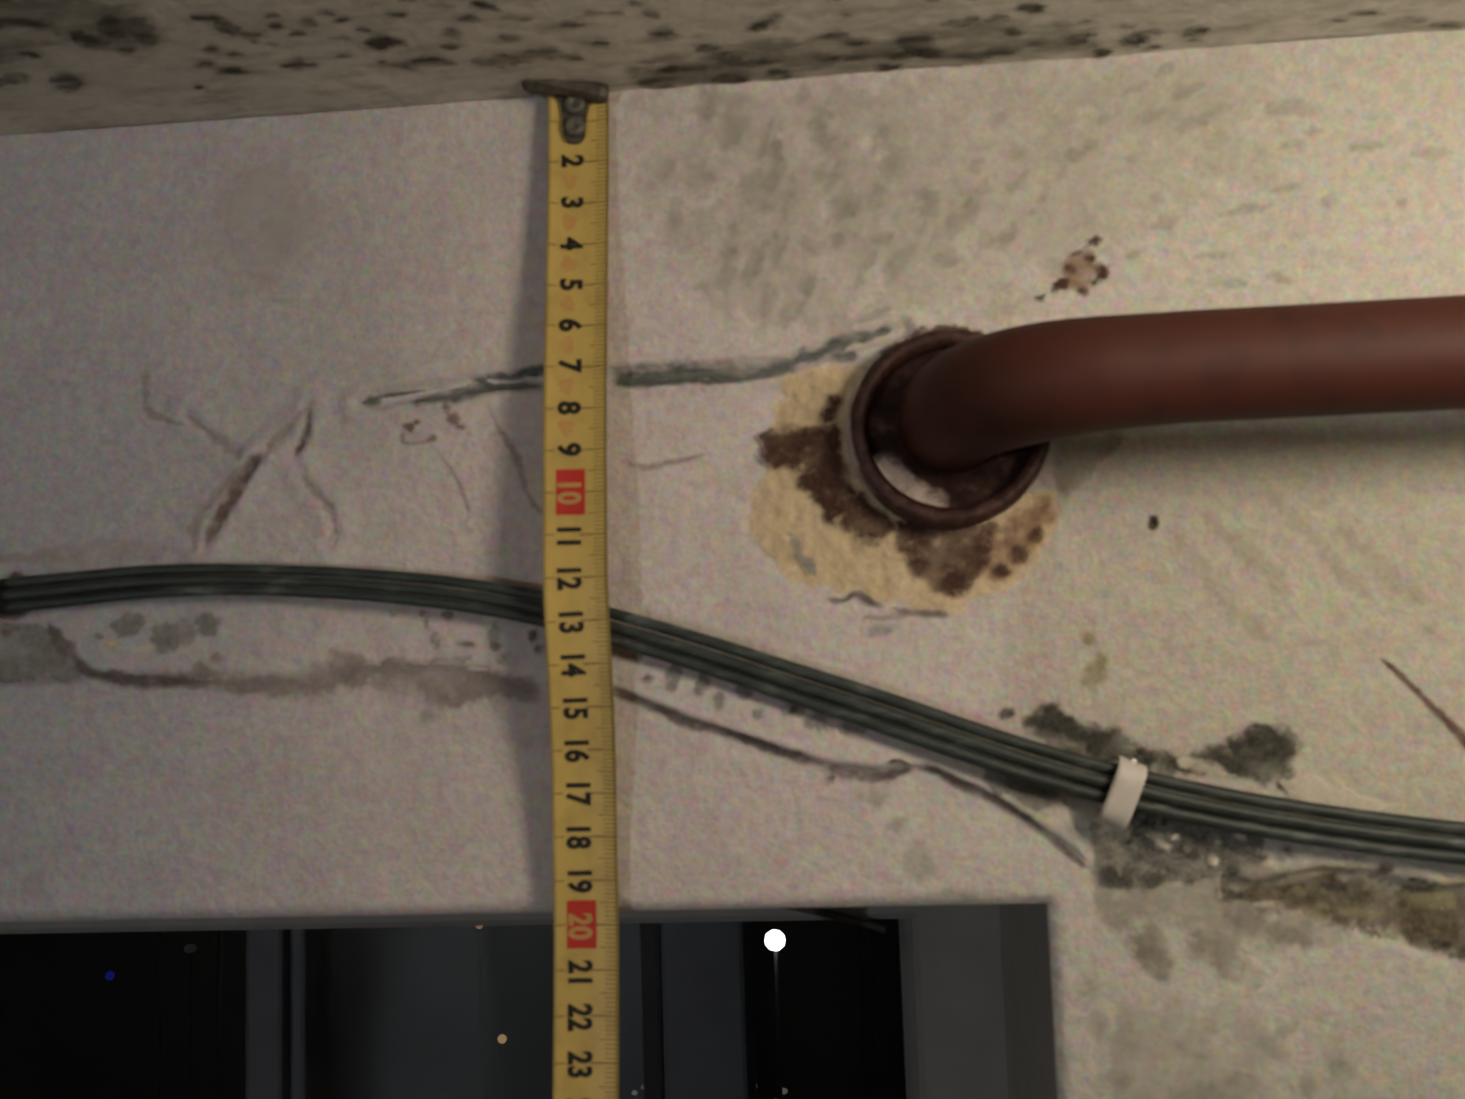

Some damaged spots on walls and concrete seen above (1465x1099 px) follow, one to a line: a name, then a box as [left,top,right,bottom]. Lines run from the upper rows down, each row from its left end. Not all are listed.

mould [0,0,156,58]
mould [191,1,610,74]
mould [620,1,676,39]
mould [628,3,1161,88]
rust [1036,236,1110,301]
crack [296,422,310,455]
crack [206,454,261,543]
rust [759,394,1058,596]
water stain [320,656,536,708]
crack [618,694,1086,867]
spalling [983,770,1465,958]